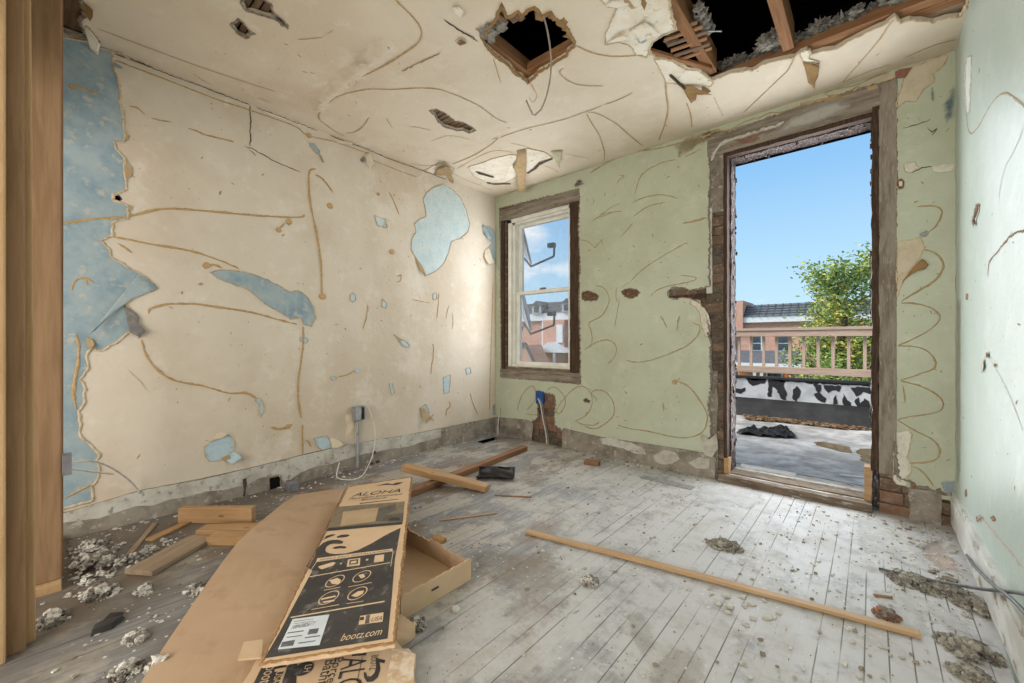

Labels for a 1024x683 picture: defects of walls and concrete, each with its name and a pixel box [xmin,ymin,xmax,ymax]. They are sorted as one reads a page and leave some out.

crack [114,53,444,179]
spalling [429,109,477,134]
peeling [600,0,714,103]
peeling [723,49,948,134]
peeling [63,0,441,523]
peeling [411,148,599,431]
peeling [601,145,718,469]
peeling [895,236,929,299]
peeling [892,430,952,496]